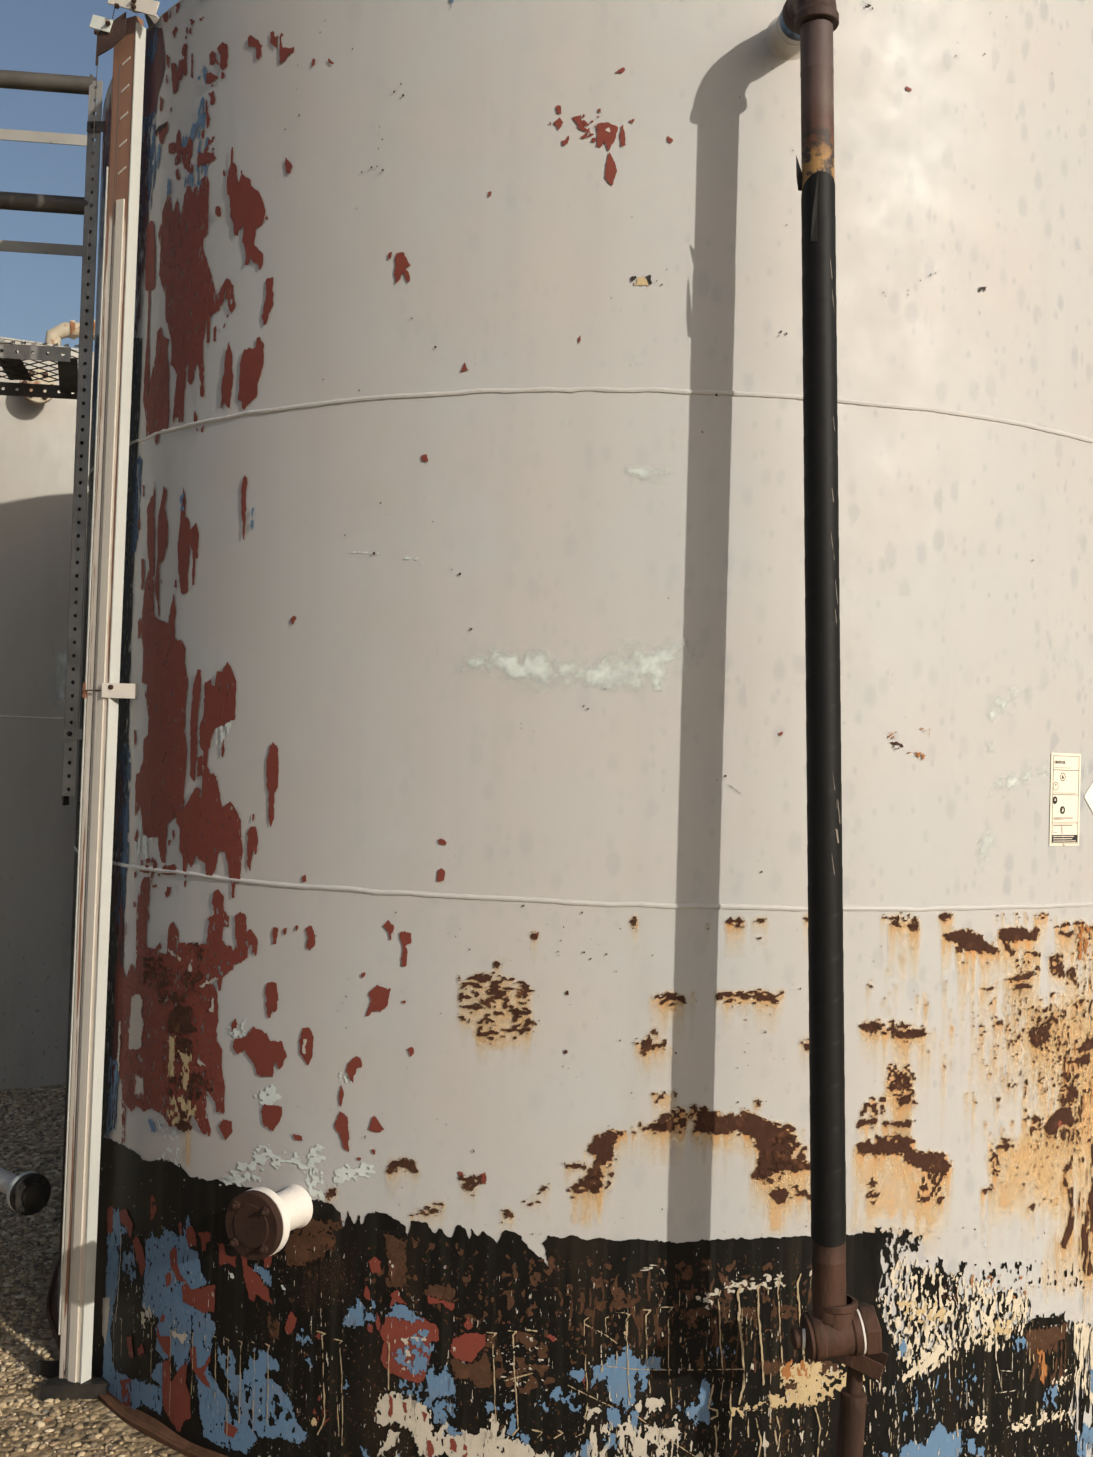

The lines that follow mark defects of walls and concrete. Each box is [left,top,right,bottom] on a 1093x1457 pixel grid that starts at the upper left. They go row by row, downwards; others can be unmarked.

peeling [248,31,334,66]
peeling [549,105,634,185]
peeling [100,3,316,1167]
water stain [467,645,682,690]
corrosion [434,912,607,1045]
corrosion [611,983,801,1058]
peeling [219,1172,261,1187]
corrosion [501,1091,811,1235]
corrosion [853,912,1093,1292]
peeling [102,1195,865,1457]